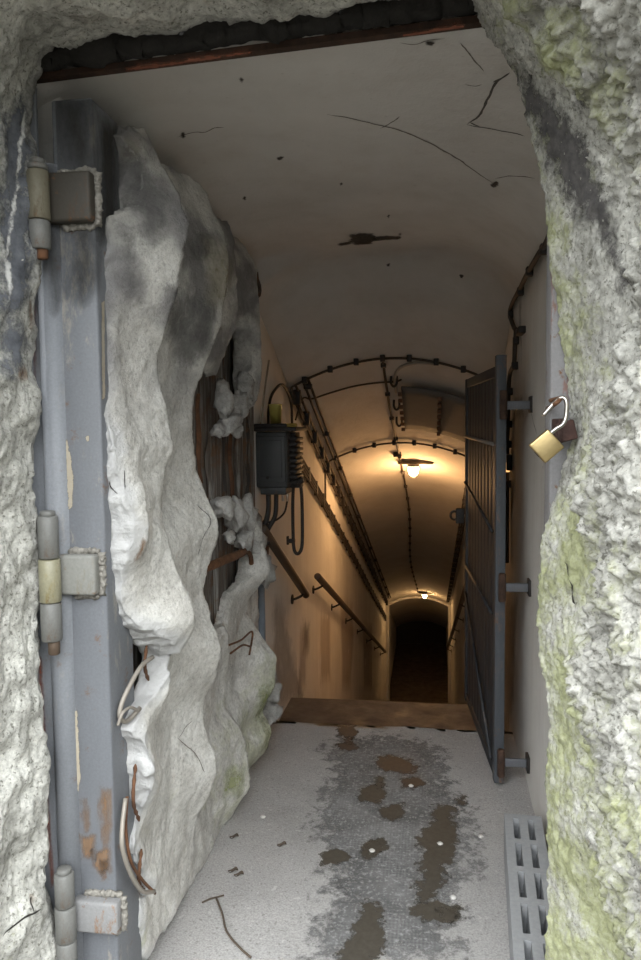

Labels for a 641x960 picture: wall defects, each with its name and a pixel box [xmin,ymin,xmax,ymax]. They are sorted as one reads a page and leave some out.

rust [126,51,251,70]
crack [327,114,531,182]
leakage [335,724,360,751]
rust [131,764,140,822]
leakage [357,754,426,822]
rust [82,793,111,874]
rust [137,849,145,889]
leakage [318,837,389,866]
leakage [408,795,468,926]
leakage [333,898,390,960]